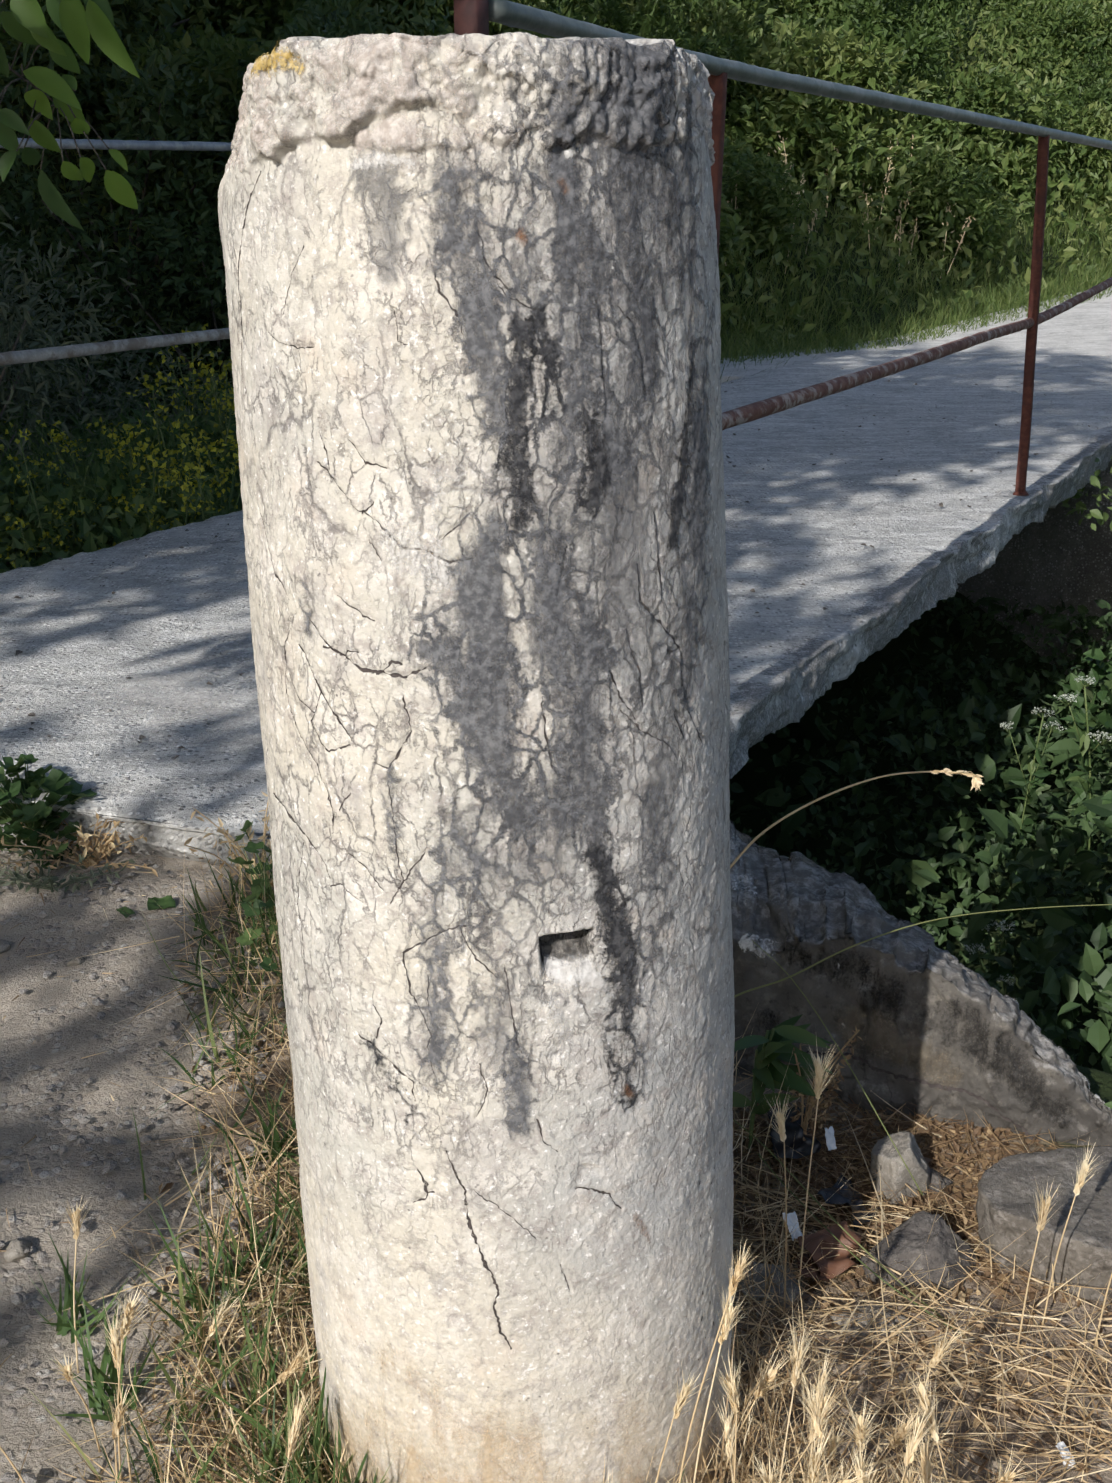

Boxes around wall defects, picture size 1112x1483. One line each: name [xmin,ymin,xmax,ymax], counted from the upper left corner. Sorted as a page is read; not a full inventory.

leakage [349,153,415,169]
crack [238,171,313,371]
leakage [77,626,260,742]
leakage [300,581,312,635]
crack [260,513,426,960]
crack [317,434,470,584]
leakage [383,37,765,1112]
crack [611,511,702,758]
leakage [363,1038,424,1124]
crack [359,925,522,1095]
leakage [503,1031,537,1138]
crack [413,1151,536,1349]